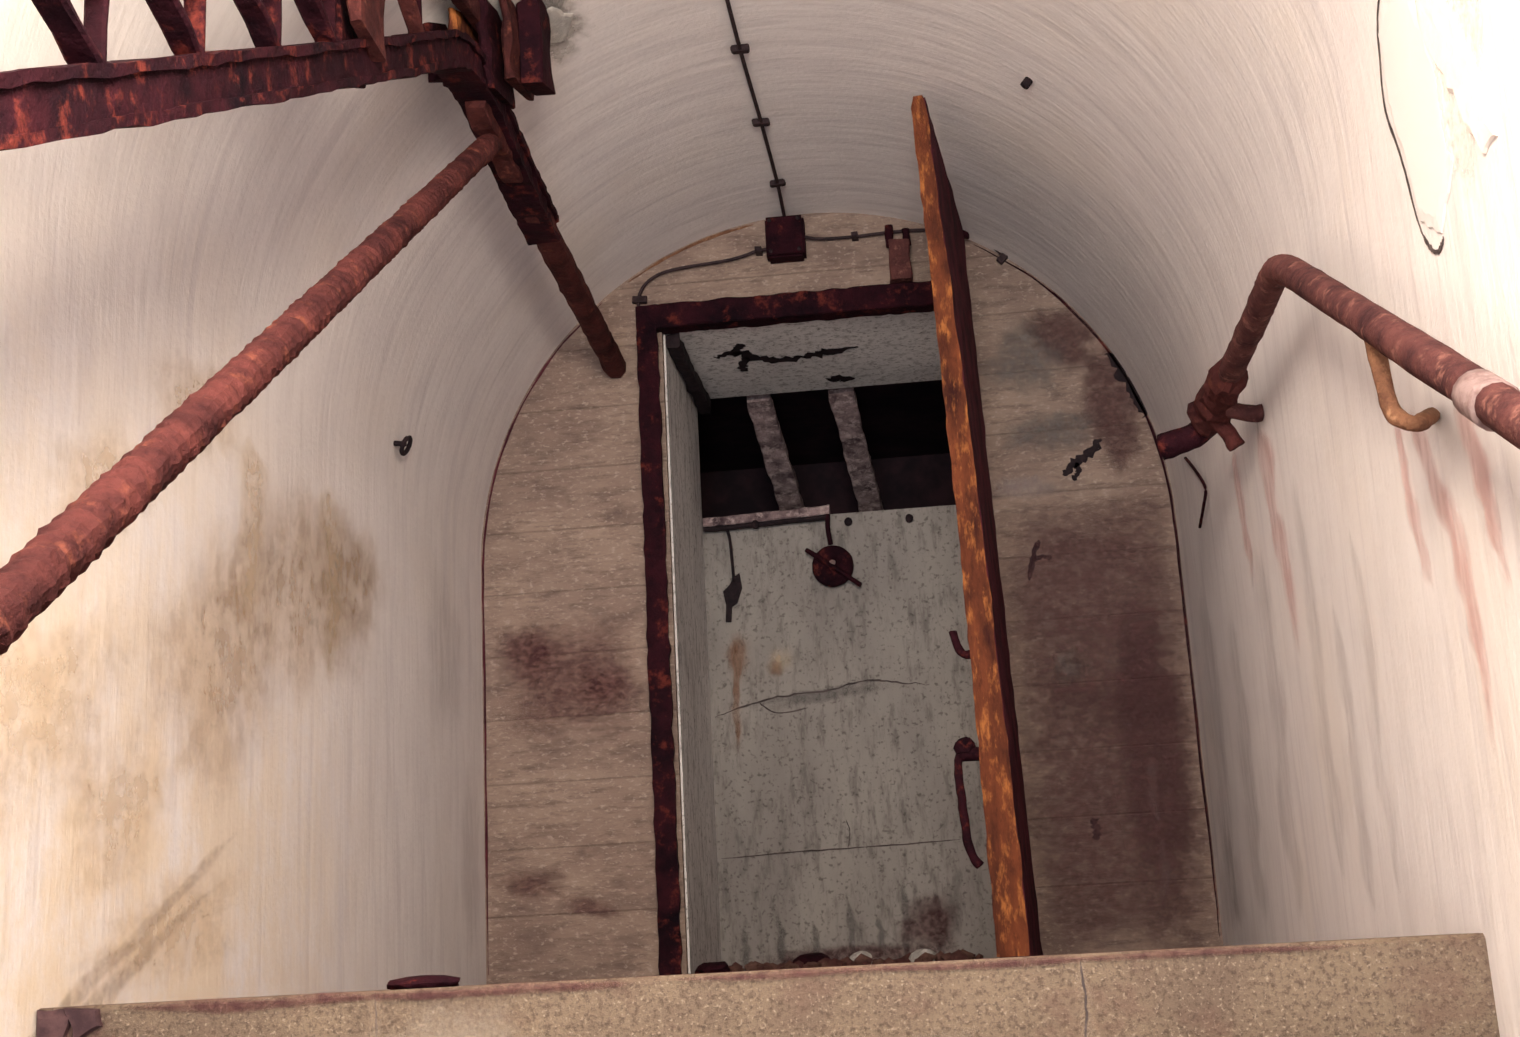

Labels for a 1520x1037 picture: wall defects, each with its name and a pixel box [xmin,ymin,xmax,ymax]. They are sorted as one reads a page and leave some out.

spalling [488,0,521,20]
spalling [542,0,577,58]
crack [714,344,858,382]
water stain [1020,519,1197,933]